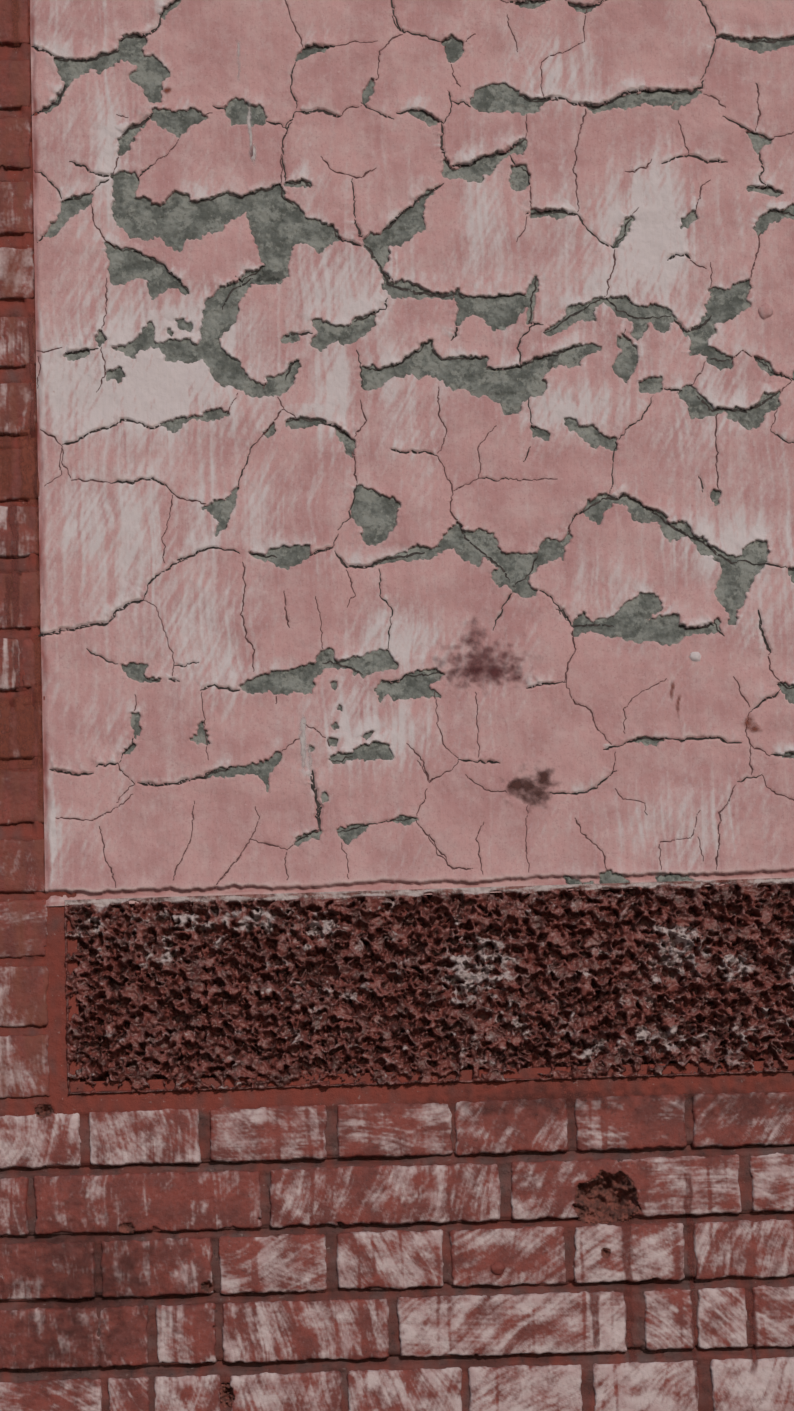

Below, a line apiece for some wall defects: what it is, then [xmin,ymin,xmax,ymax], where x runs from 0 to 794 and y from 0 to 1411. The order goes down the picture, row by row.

crack [501,0,607,96]
crack [282,0,403,237]
crack [397,90,471,167]
crack [625,83,793,198]
crack [543,207,639,296]
crack [40,393,238,486]
crack [284,399,367,530]
peeling [31,16,794,792]
crack [391,387,553,524]
crack [38,547,239,683]
crack [216,631,794,885]
crack [49,762,135,888]